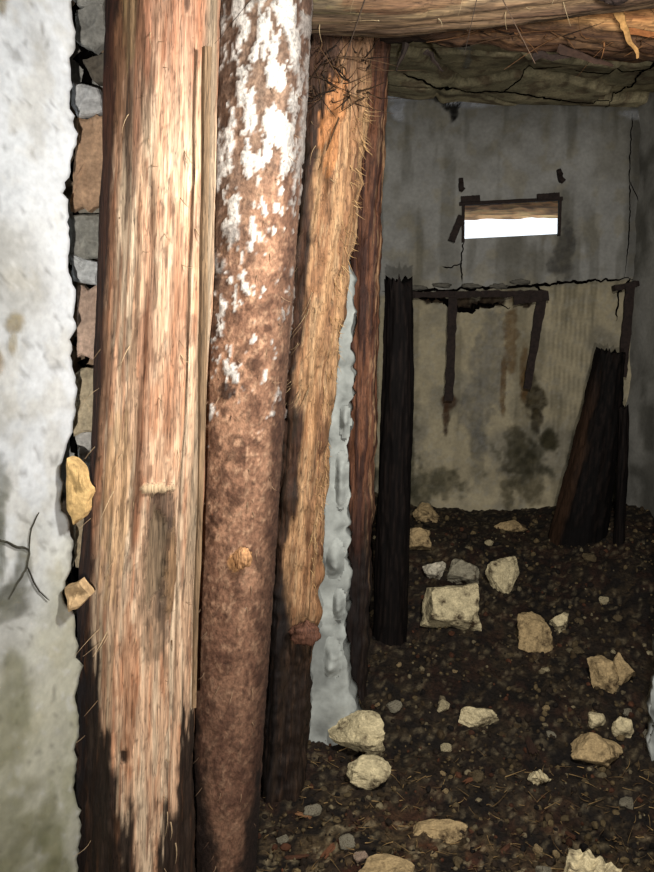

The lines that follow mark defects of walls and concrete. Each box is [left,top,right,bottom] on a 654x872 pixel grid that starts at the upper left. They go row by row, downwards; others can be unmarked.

crack [72,3,80,22]
crack [73,44,102,85]
crack [403,62,654,107]
crack [68,150,76,182]
crack [413,120,638,321]
spalling [65,0,105,612]
crack [72,336,90,368]
rust [442,397,456,434]
damp [521,375,557,448]
crack [70,421,78,457]
crack [0,512,50,601]
crack [66,544,79,584]